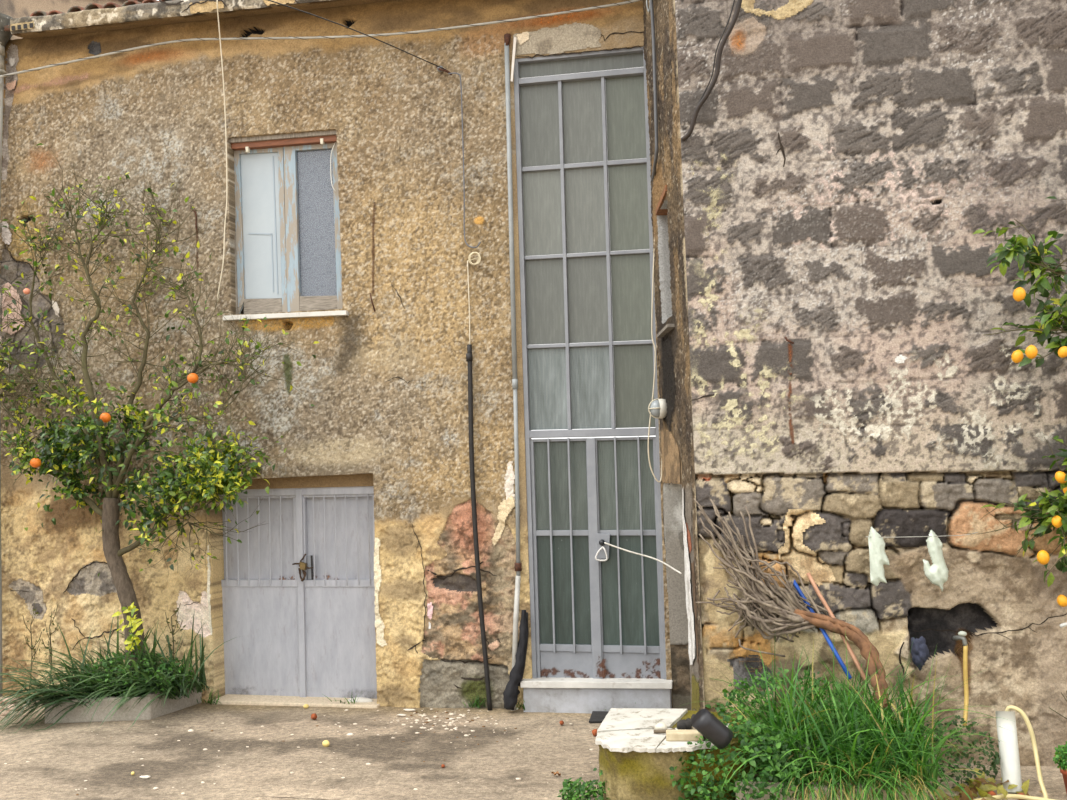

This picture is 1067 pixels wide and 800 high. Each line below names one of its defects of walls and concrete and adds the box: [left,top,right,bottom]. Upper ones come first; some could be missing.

peeling [516,32,529,45]
spalling [9,579,47,620]
spalling [67,561,117,597]
spalling [418,461,521,709]
spalling [661,430,699,696]
corrosion [540,657,661,679]
spalling [907,603,998,661]
crack [899,614,1067,674]